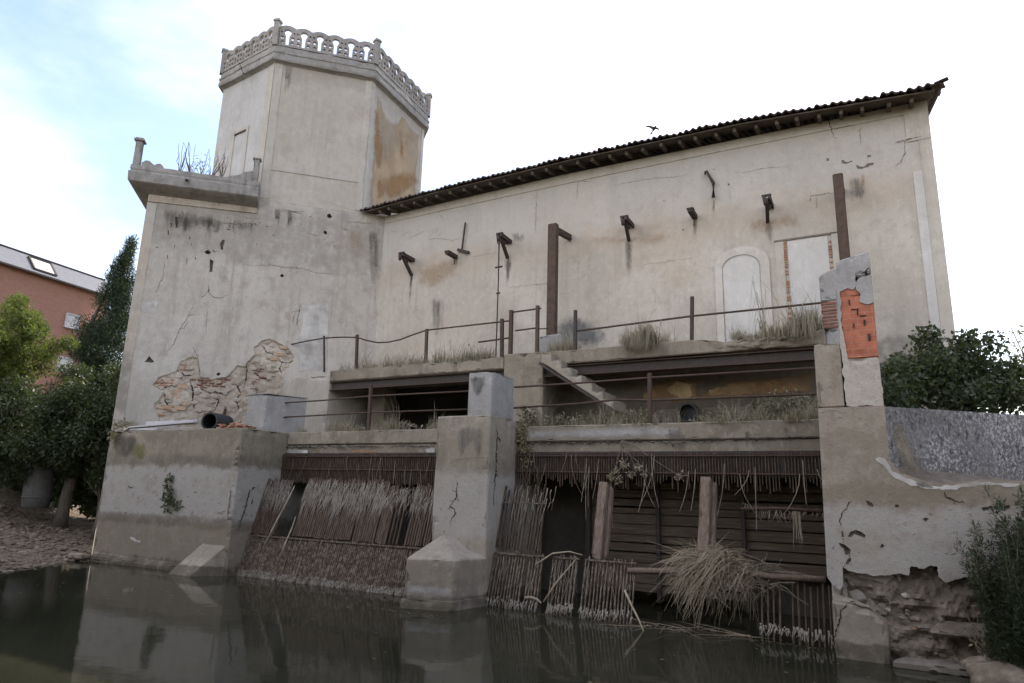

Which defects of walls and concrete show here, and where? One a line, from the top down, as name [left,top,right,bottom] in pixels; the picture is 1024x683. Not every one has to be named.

damp [178,215,217,229]
crack [154,286,291,410]
spalling [152,338,295,429]
crack [179,487,255,530]
crack [286,428,832,522]
spalling [839,530,993,663]